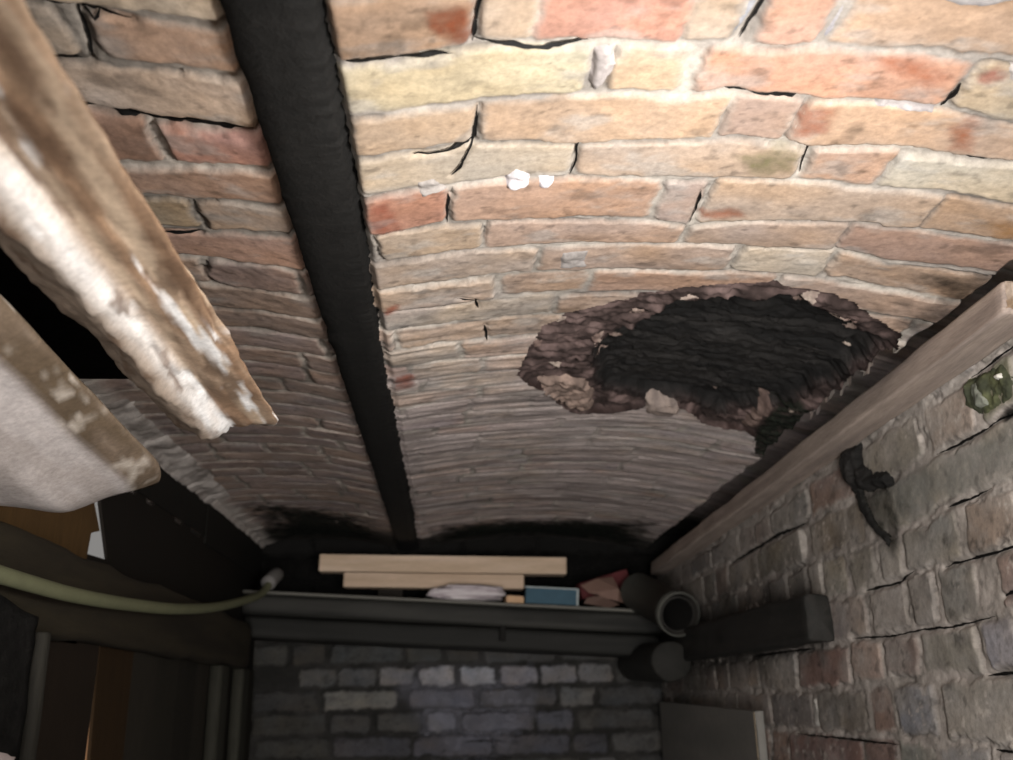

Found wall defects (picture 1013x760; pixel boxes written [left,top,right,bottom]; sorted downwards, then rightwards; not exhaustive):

crack [739,0,764,37]
crack [414,105,478,222]
spalling [517,280,903,458]
crack [948,489,990,508]
damp [255,506,372,539]
damp [439,520,655,543]
crack [733,522,808,563]
crack [947,546,1013,567]
crack [866,571,914,591]
crack [854,590,1013,639]